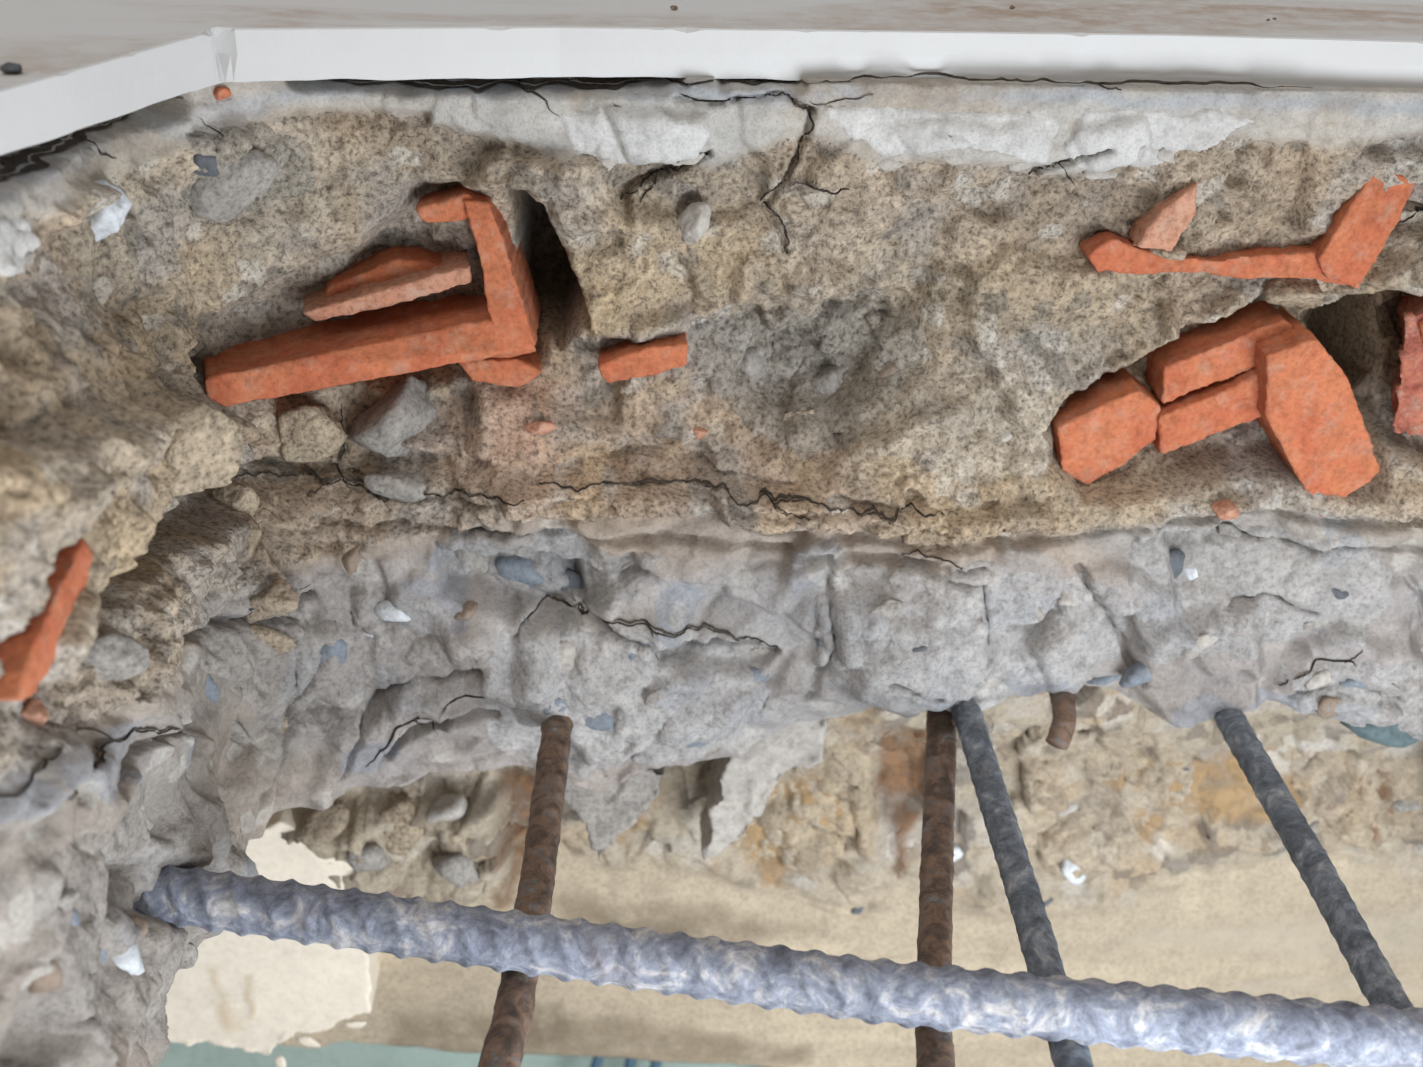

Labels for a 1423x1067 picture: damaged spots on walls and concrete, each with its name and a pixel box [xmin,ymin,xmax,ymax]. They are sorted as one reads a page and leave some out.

crack [329,72,1313,254]
crack [233,403,389,503]
crack [424,477,962,571]
crack [524,576,778,660]
rust [505,771,535,880]
spalling [0,519,1423,1067]
rust [878,730,927,871]